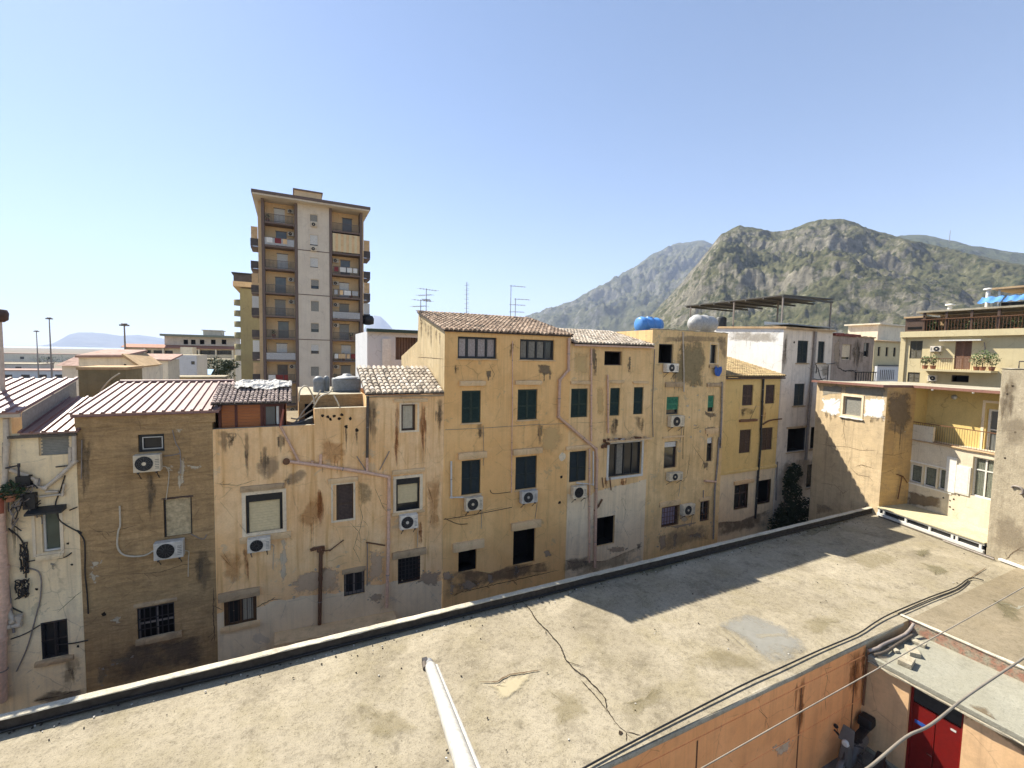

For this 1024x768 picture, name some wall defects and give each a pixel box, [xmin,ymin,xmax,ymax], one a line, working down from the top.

leakage [671,342,705,391]
peeling [821,385,845,416]
crack [452,570,639,741]
spalling [481,669,548,699]